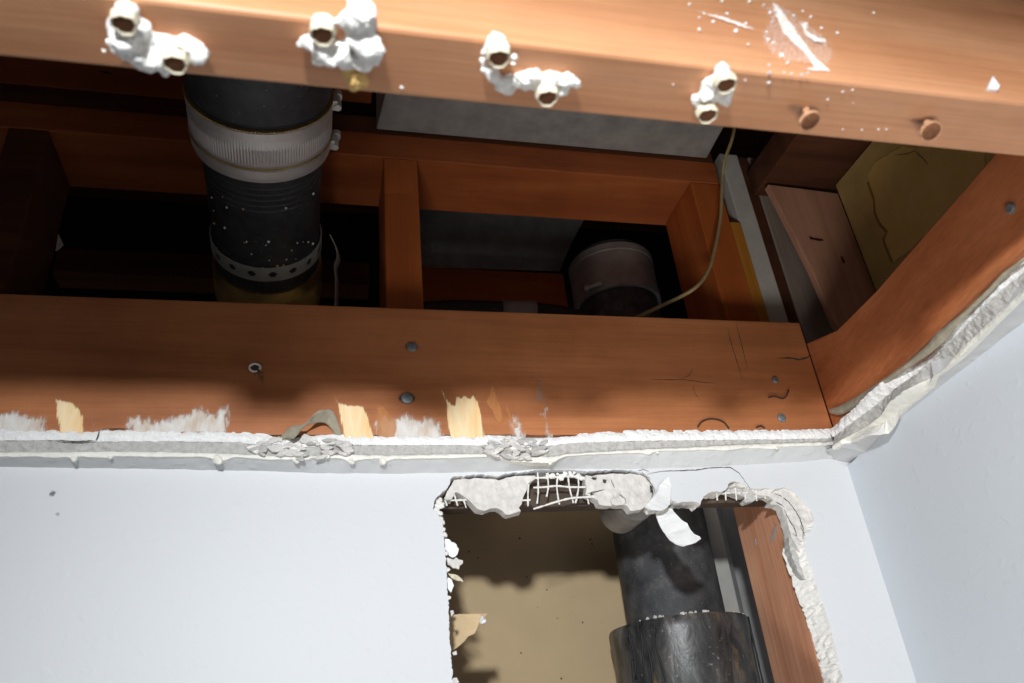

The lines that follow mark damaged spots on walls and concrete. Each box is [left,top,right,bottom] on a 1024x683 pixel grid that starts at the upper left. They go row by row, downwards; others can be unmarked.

flaking render [0,257,1024,616]